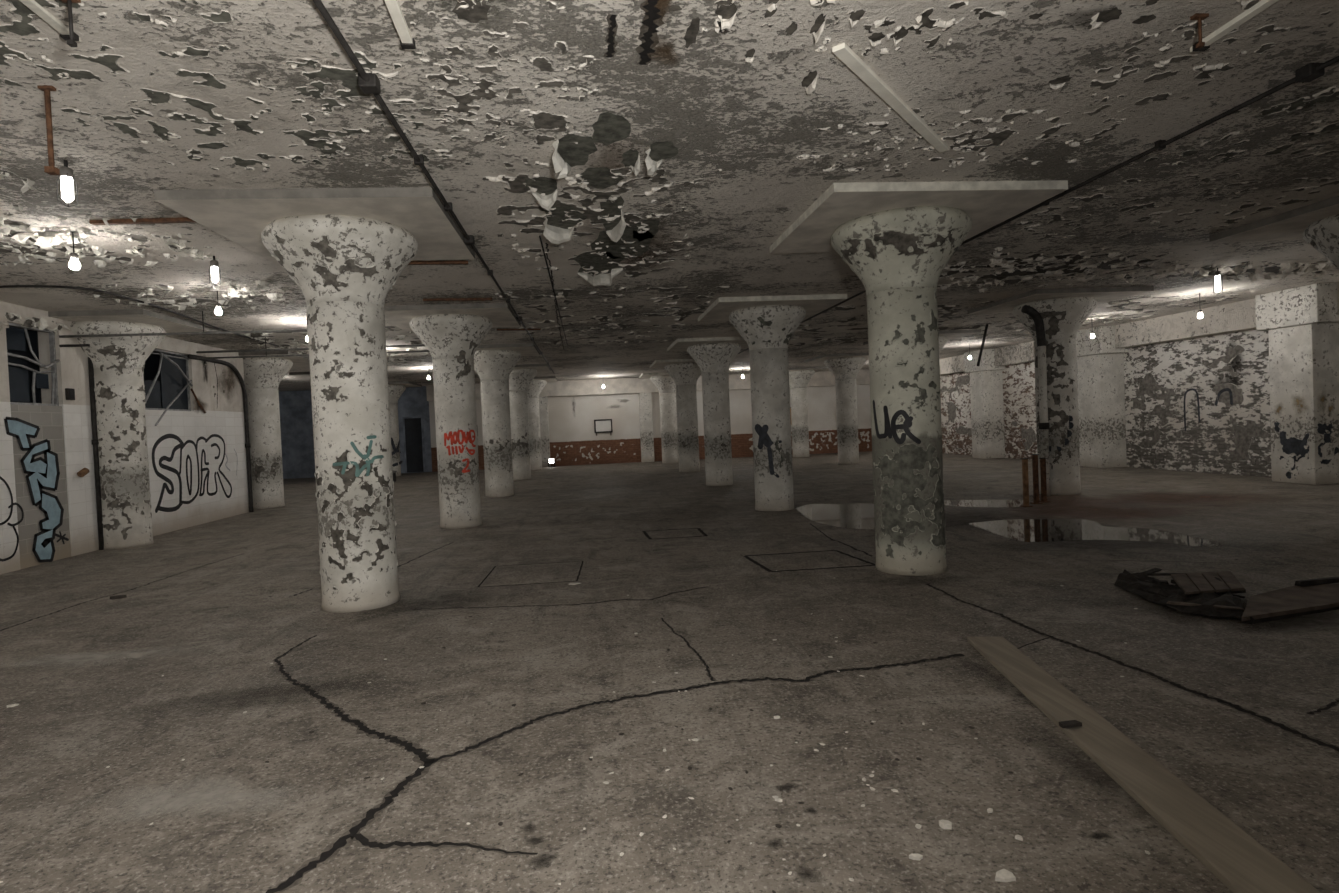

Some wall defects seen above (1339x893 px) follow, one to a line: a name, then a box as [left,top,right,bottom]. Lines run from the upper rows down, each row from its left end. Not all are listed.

peeling [0,0,130,87]
peeling [0,151,213,268]
peeling [60,0,737,345]
peeling [745,48,755,63]
peeling [760,0,1290,174]
peeling [92,234,478,416]
peeling [839,120,1339,559]
peeling [81,345,152,540]
peeling [314,444,398,591]
peeling [441,432,529,478]
crack [266,587,965,893]
crack [925,584,1339,754]